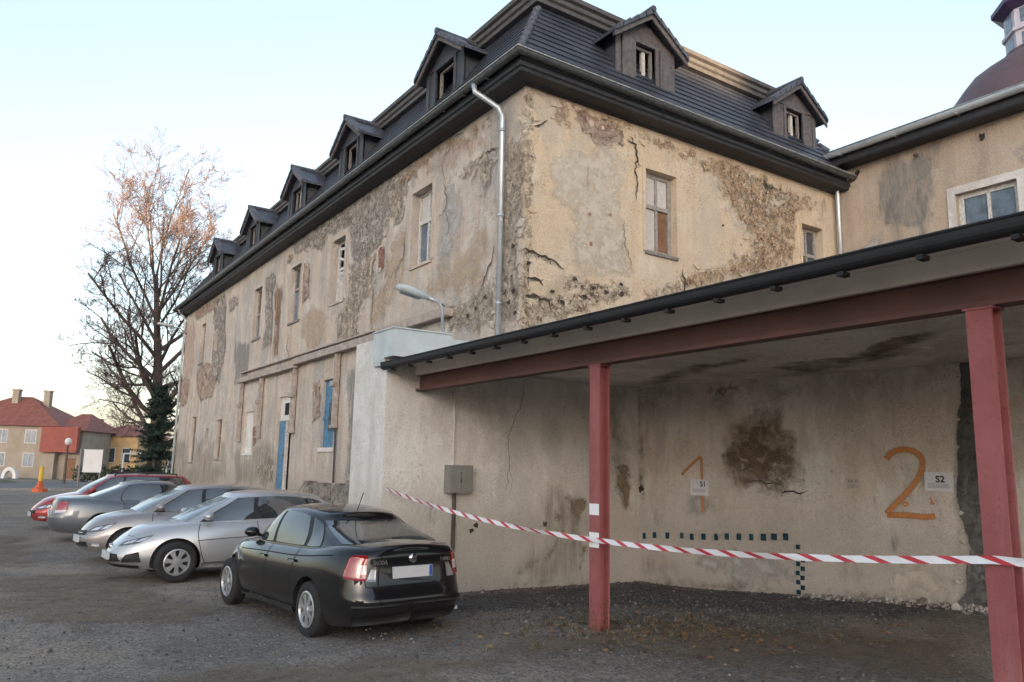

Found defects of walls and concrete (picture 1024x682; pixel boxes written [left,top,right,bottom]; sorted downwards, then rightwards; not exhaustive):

spalling [336,116,491,343]
crack [437,129,465,226]
crack [481,248,564,306]
spalling [447,86,812,334]
crack [627,136,642,199]
spalling [179,295,238,407]
leakage [617,466,630,508]
crack [750,480,809,495]